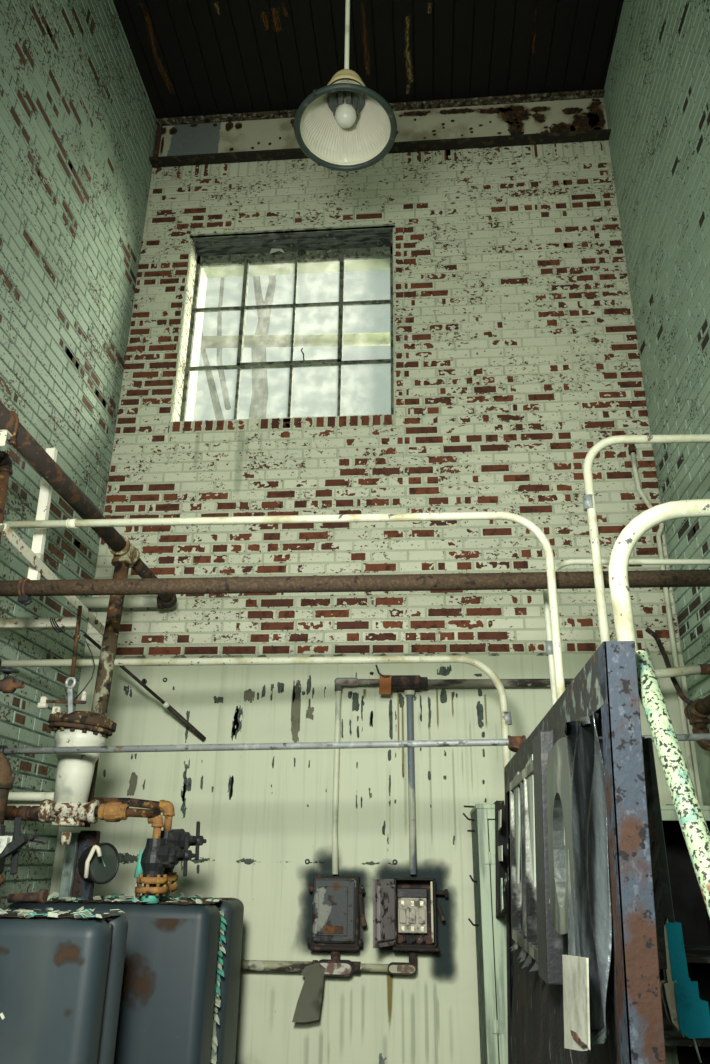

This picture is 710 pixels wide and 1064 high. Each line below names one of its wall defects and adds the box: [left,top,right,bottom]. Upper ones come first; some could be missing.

peeling [1,70,93,239]
rust [399,98,606,139]
peeling [57,122,279,442]
peeling [104,142,684,575]
peeling [43,497,93,579]
peeling [116,589,544,655]
peeling [567,643,596,651]
peeling [231,676,326,742]
peeling [341,691,373,738]
peeling [388,689,458,761]
peeling [473,673,485,757]
peeling [180,758,214,819]